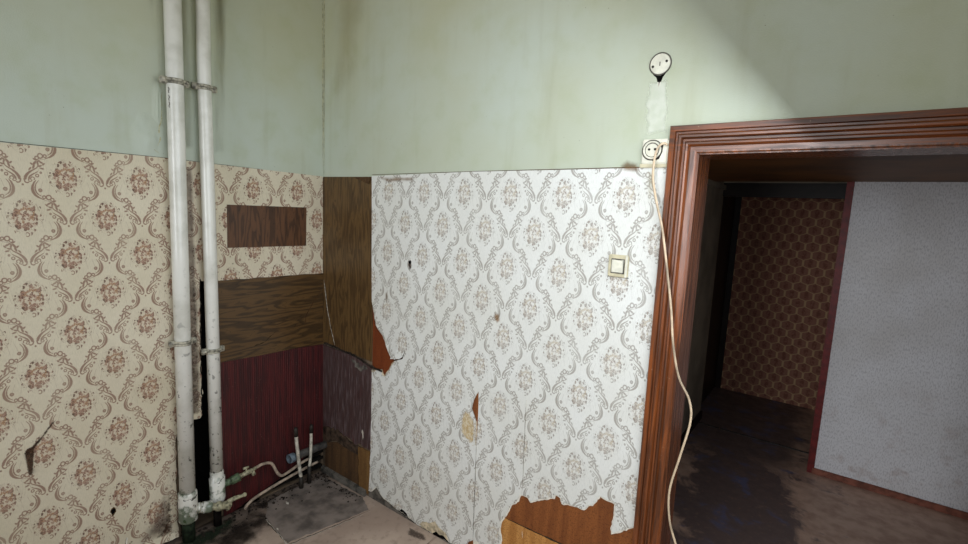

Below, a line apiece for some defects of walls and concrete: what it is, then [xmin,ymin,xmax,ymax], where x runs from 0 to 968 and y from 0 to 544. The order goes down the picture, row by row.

leakage [144,504,268,544]